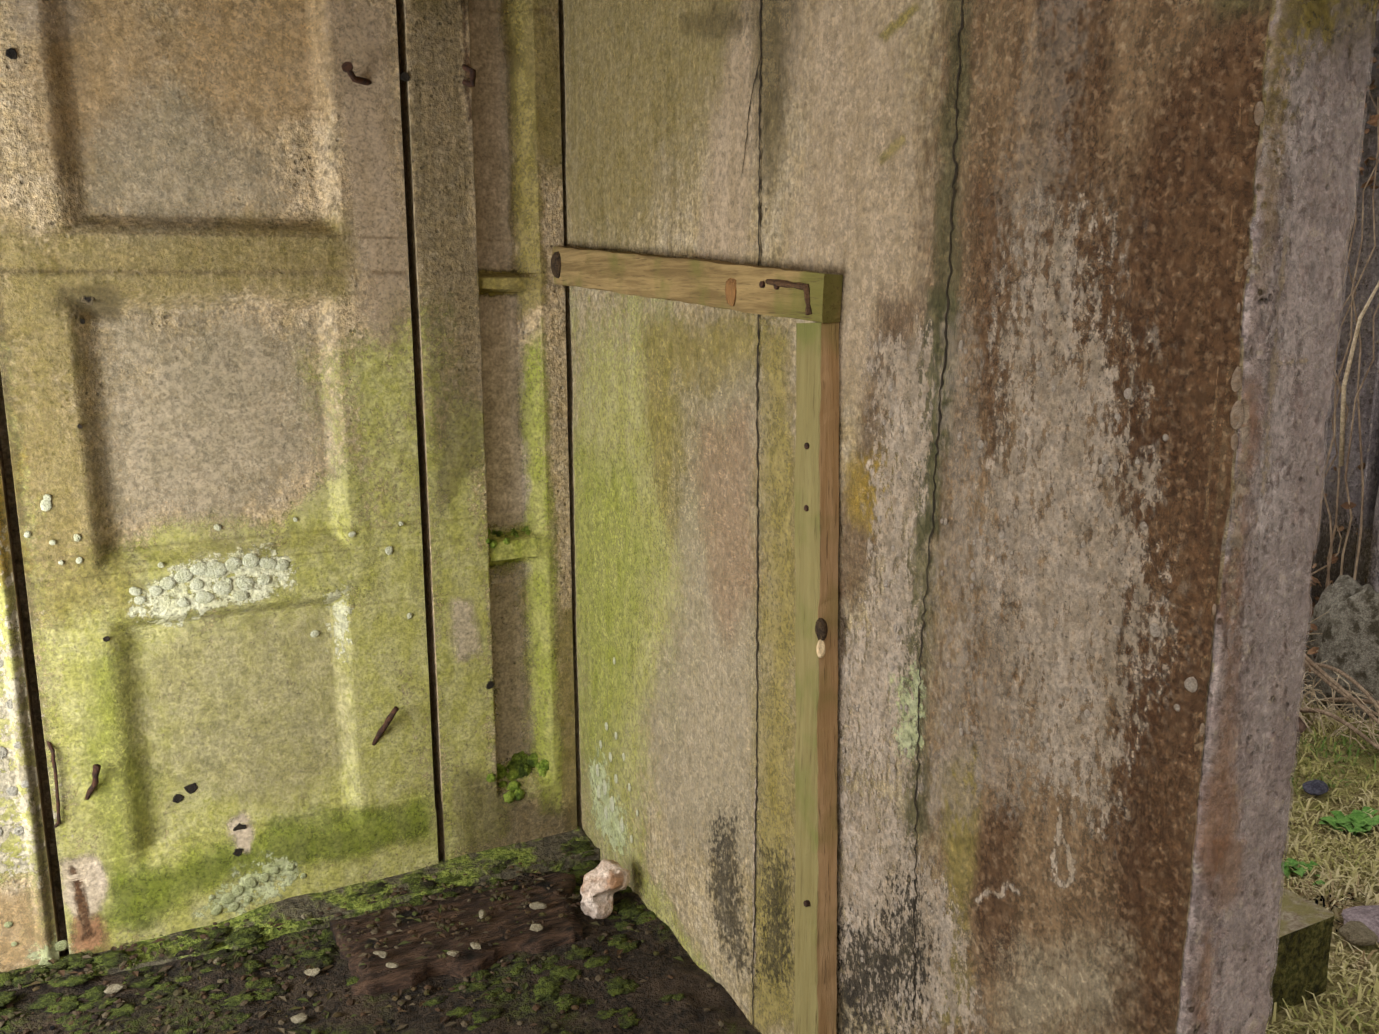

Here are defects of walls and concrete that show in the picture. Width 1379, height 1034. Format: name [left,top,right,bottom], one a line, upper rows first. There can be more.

damp [0,230,380,662]
rust [70,866,107,953]
damp [634,861,708,973]
damp [705,806,795,993]